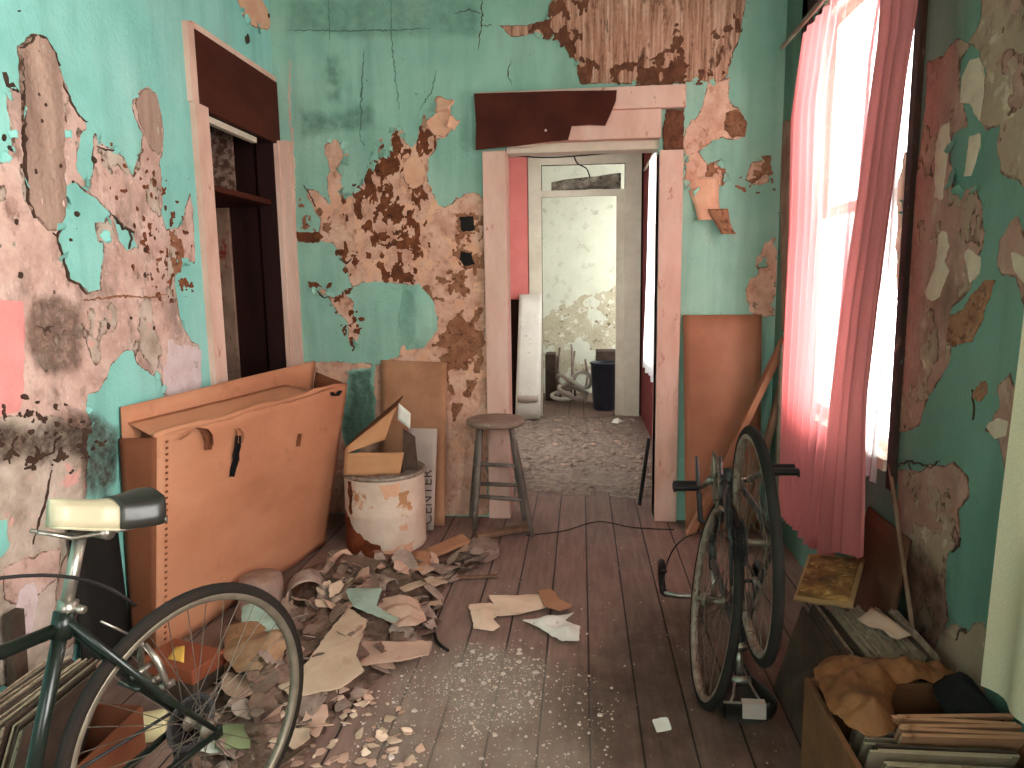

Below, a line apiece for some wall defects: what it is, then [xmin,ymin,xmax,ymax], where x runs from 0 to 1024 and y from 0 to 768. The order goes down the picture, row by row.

crack [293,0,436,146]
crack [455,3,491,49]
flaking render [515,0,791,331]
peeling [895,0,1024,432]
damp [28,298,81,372]
damp [0,414,117,497]
peeling [0,68,202,645]
peeling [296,96,489,515]
peeling [543,285,616,376]
peeling [972,373,1015,471]
peeling [897,462,986,695]
peeling [27,640,51,671]